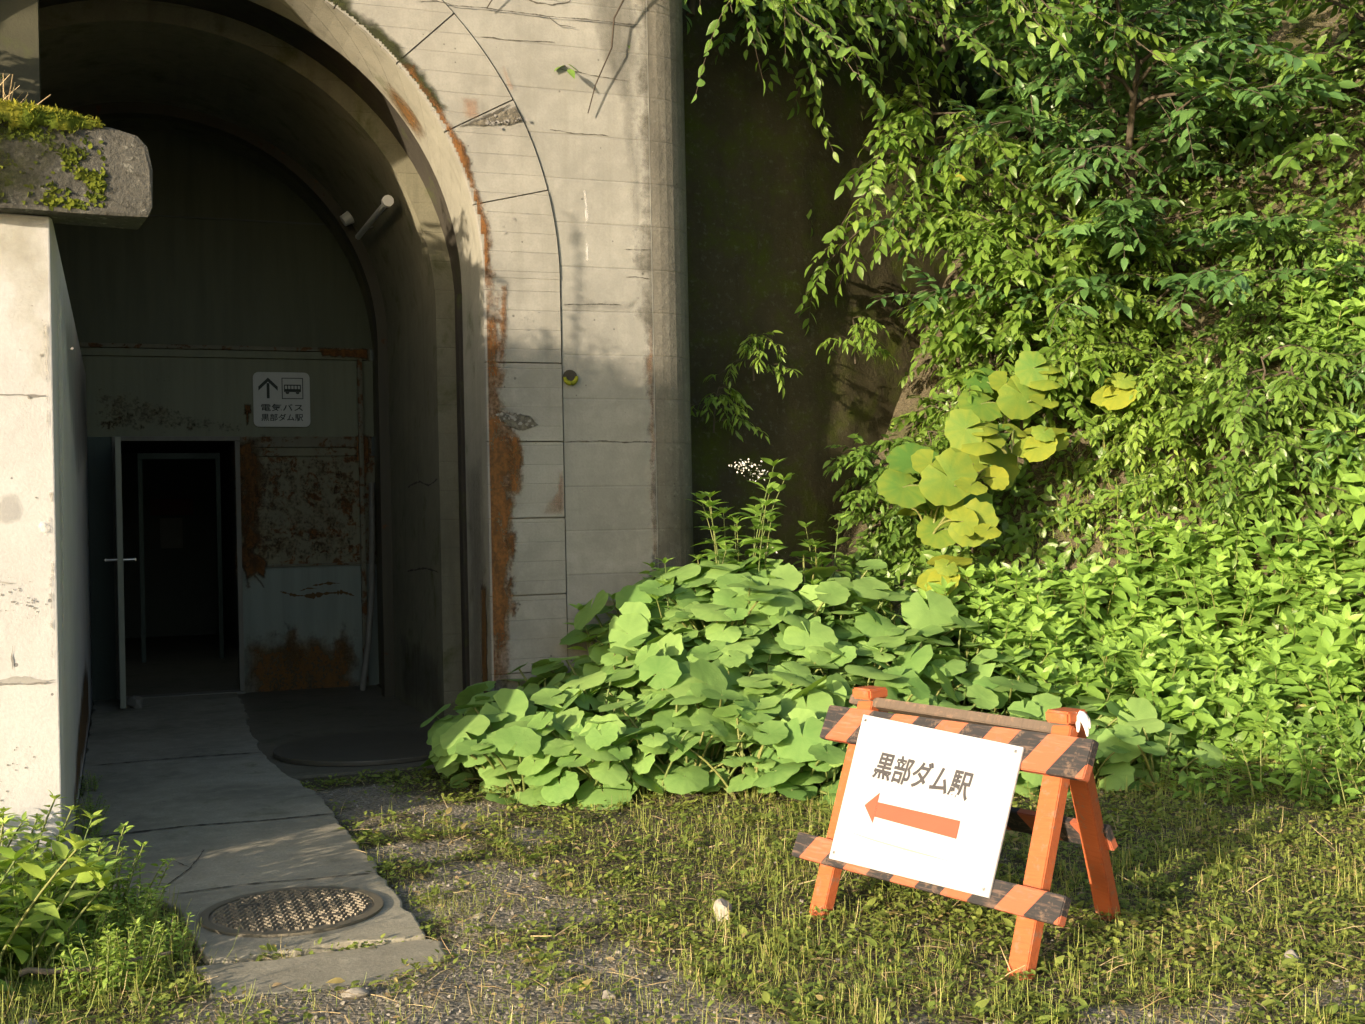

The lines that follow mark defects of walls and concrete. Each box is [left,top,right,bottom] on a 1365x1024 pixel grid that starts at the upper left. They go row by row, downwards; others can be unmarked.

rust [391,90,421,132]
spalling [464,106,529,129]
damp [641,225,654,384]
rust [406,67,523,693]
spalling [494,410,551,430]
rust [235,404,264,568]
crack [0,648,54,685]
rust [245,630,356,692]